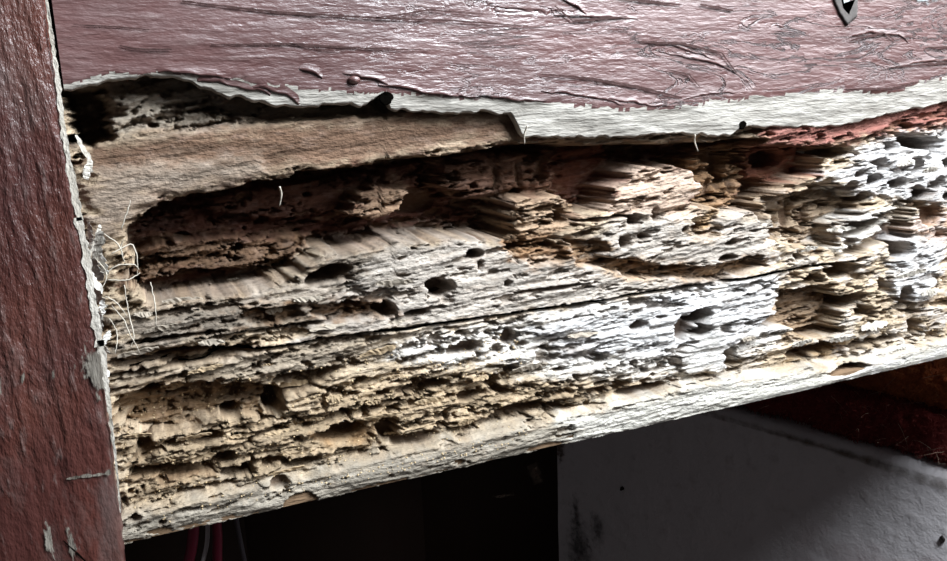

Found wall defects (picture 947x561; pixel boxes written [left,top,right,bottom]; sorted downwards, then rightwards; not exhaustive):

peeling [554,0,638,21]
peeling [846,26,909,43]
peeling [647,44,738,75]
peeling [155,63,300,105]
peeling [343,68,735,107]
peeling [896,160,939,173]
spalling [74,223,111,403]
crack [119,263,828,366]
peeling [309,323,345,332]
peeling [828,320,888,343]
peeling [325,381,354,403]
peeling [230,428,299,439]